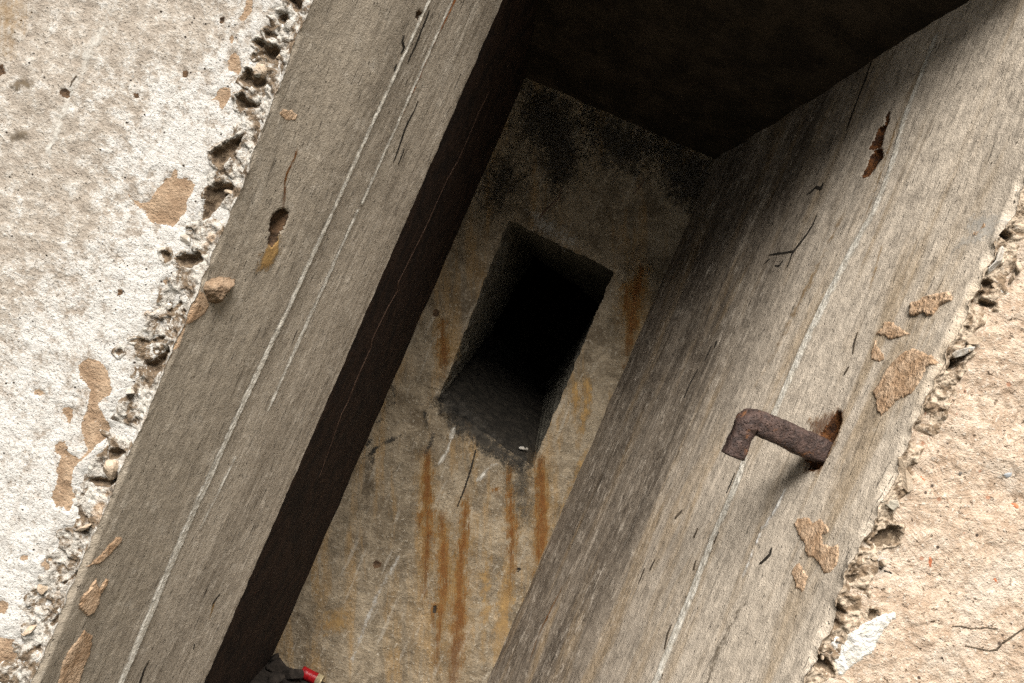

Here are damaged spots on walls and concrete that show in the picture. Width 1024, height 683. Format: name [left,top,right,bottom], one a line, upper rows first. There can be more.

spalling [0,0,313,683]
crack [318,91,490,479]
crack [457,450,476,507]
rust [416,455,520,658]
rust [533,459,550,574]
crack [764,183,824,267]
spalling [862,111,890,179]
spalling [804,186,1024,683]